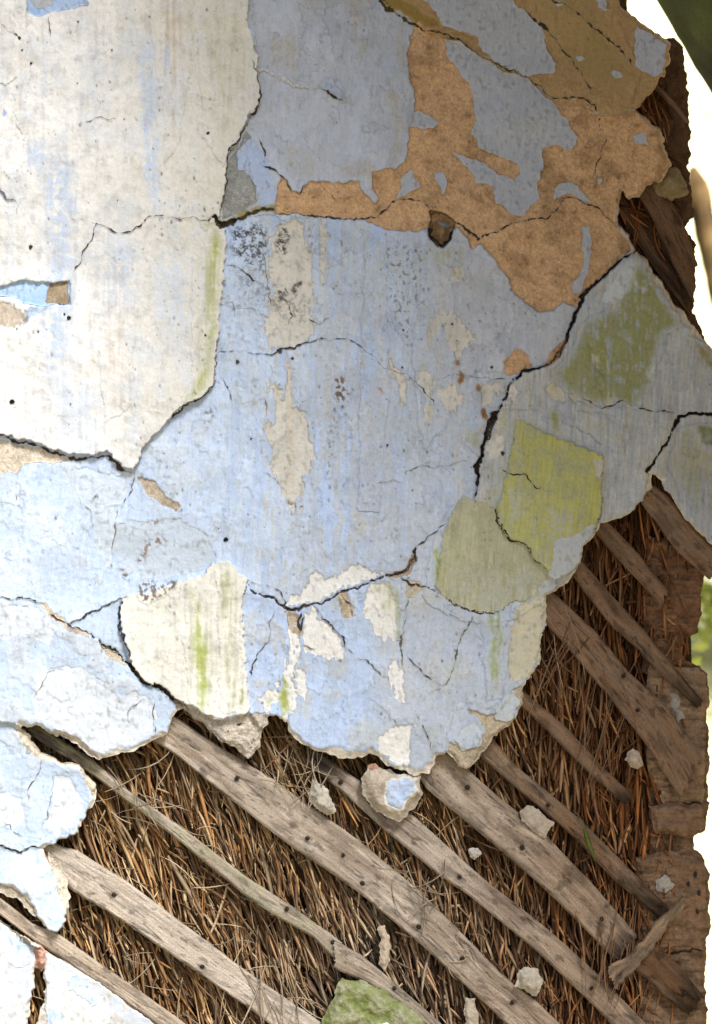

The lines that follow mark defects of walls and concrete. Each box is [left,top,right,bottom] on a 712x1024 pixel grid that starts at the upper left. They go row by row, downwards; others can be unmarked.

crack [224,61,318,191]
peeling [221,0,669,515]
crack [0,434,135,550]
peeling [0,440,219,606]
crack [71,187,637,571]
crack [570,393,712,473]
crack [5,595,179,735]
peeling [32,665,158,759]
flaking render [173,697,269,758]
peeling [277,555,423,722]
crack [250,523,521,747]
flaking render [448,524,598,769]